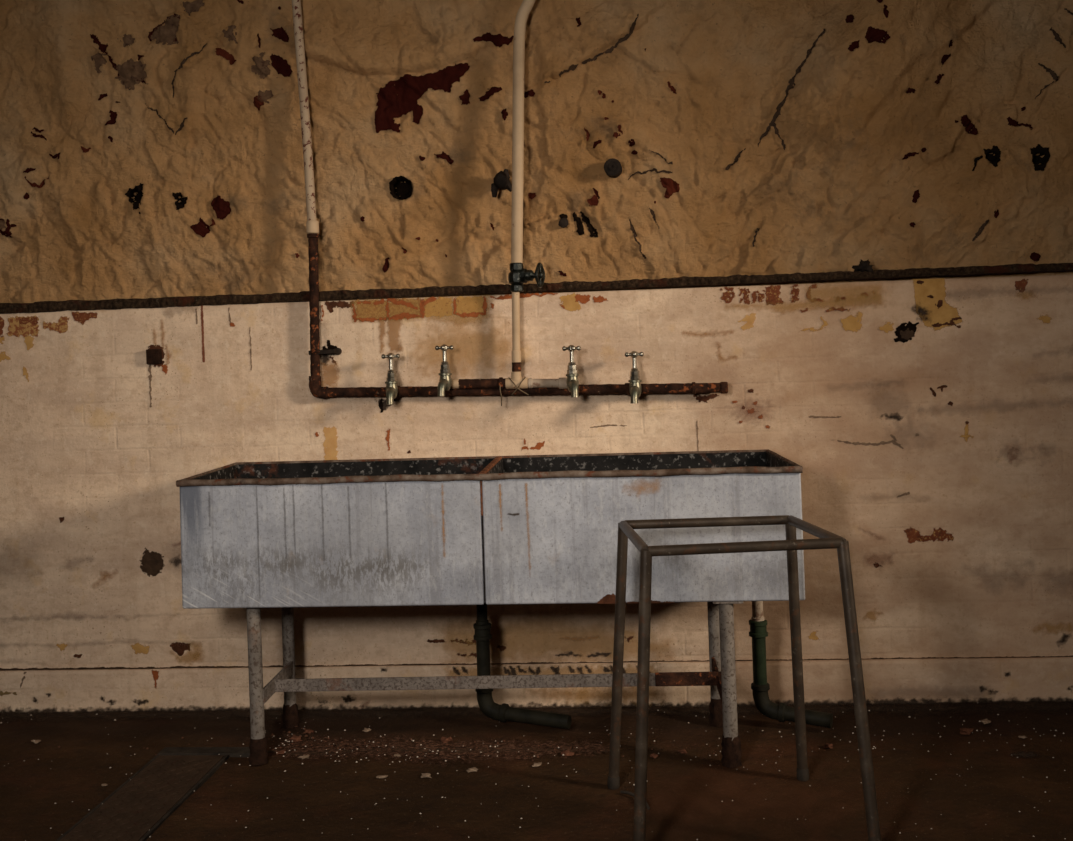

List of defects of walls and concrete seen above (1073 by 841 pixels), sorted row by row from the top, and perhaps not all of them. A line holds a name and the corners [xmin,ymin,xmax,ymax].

crack [544,14,639,83]
peeling [374,63,502,133]
peeling [190,195,231,237]
peeling [0,312,97,362]
rust [195,306,205,362]
peeling [321,293,607,322]
peeling [720,284,881,332]
peeling [880,278,962,343]
peeling [170,642,195,662]